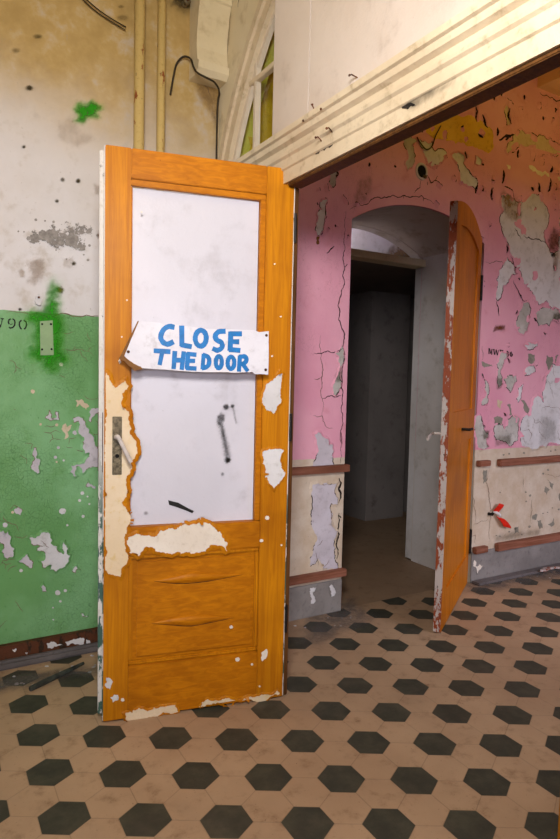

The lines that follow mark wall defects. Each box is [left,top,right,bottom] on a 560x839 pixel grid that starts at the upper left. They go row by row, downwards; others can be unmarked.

peeling [401,115,494,190]
crack [314,93,560,567]
peeling [474,192,560,456]
peeling [30,447,42,475]
peeling [260,446,287,493]
peeling [308,430,340,571]
peeling [0,523,82,573]